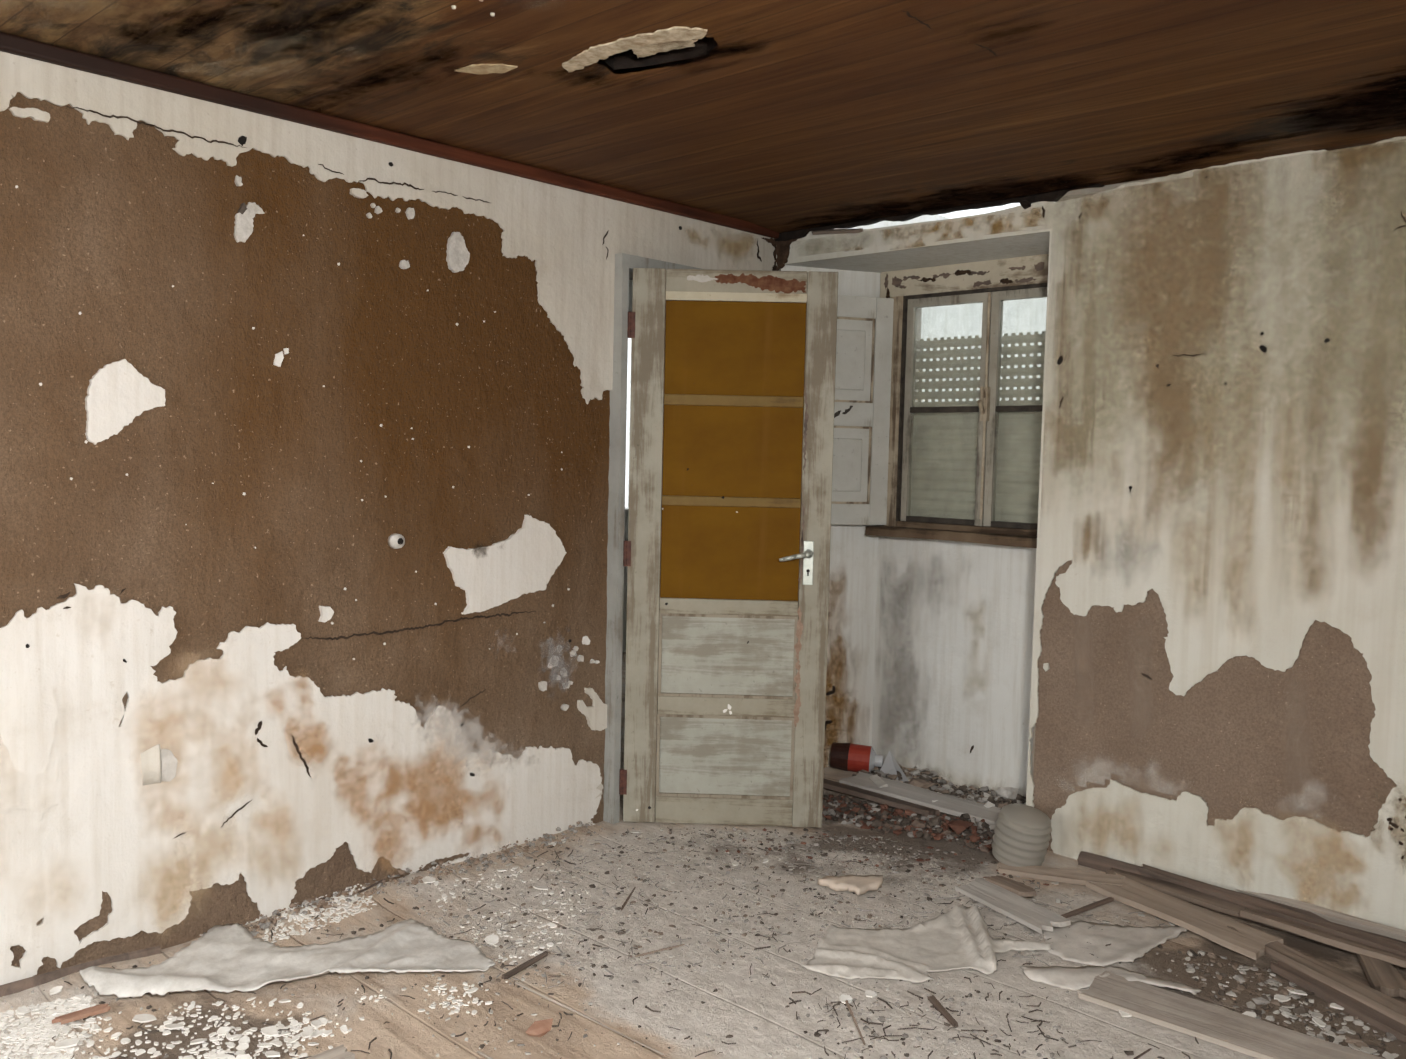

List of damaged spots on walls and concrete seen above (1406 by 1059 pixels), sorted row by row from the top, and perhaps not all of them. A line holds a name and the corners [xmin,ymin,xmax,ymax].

water stain [455,64,518,74]
peeling [884,262,1045,298]
flaking render [0,92,610,823]
flaking render [1033,560,1406,859]